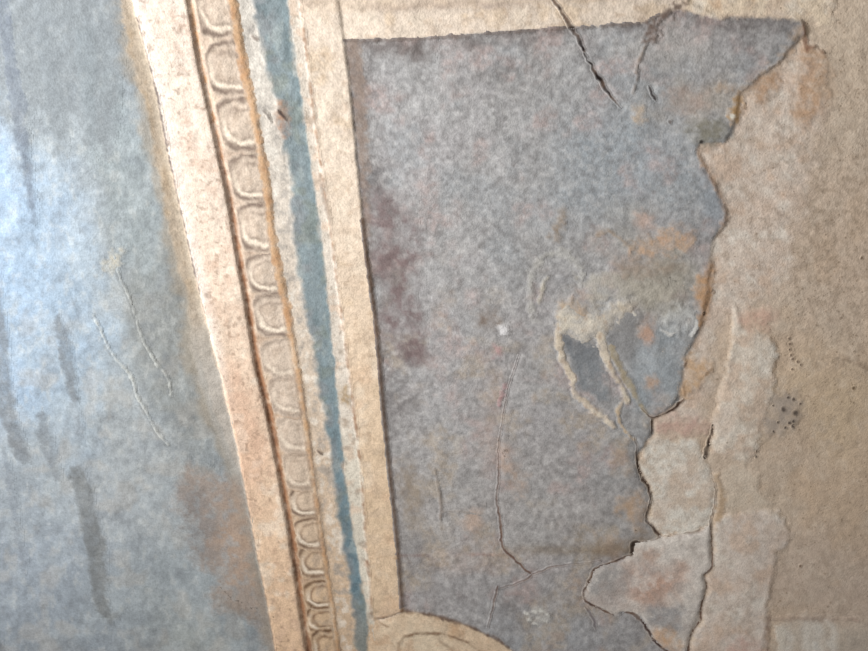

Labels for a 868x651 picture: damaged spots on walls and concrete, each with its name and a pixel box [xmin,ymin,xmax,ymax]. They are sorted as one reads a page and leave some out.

crack [550,0,691,109]
flaking render [678,0,840,48]
flaking render [524,60,841,537]
leakage [757,387,808,446]
crack [431,354,718,651]